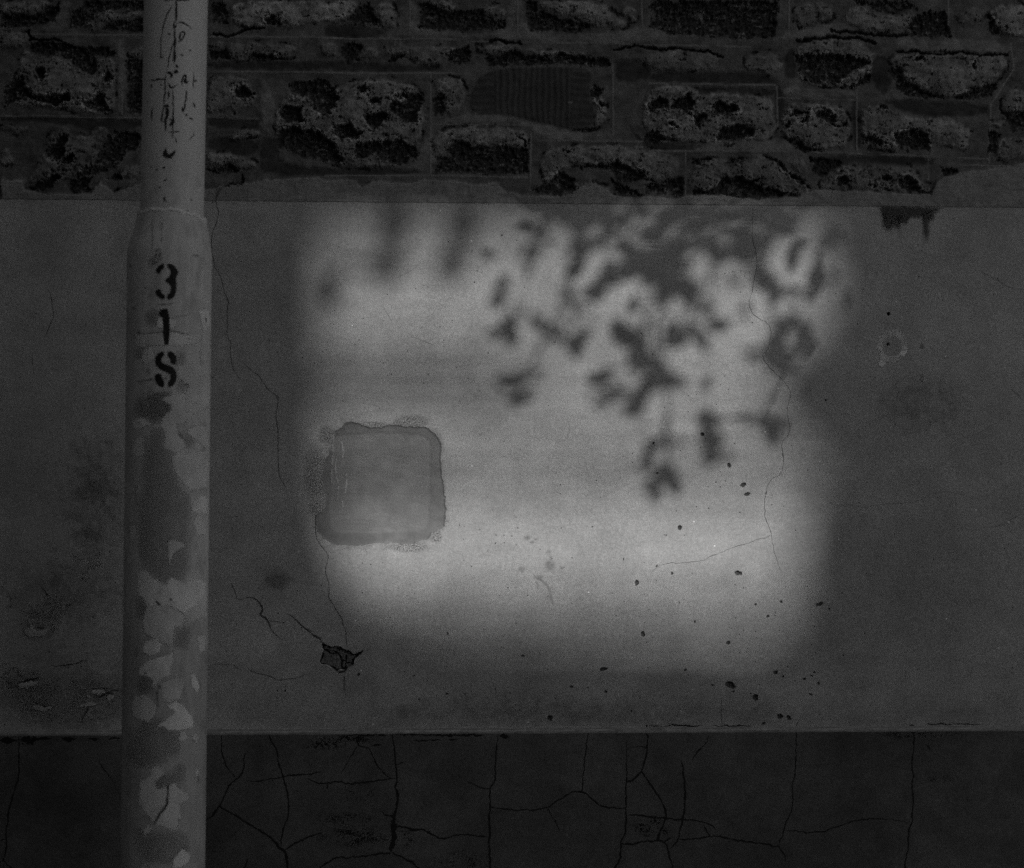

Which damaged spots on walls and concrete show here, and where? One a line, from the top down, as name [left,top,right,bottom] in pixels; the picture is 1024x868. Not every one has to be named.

peeling [132,361,210,536]
crack [211,178,284,484]
crack [654,209,791,570]
peeling [132,570,207,743]
crack [229,515,347,644]
flaking render [316,638,363,676]
peeling [138,766,188,835]
peeling [173,849,191,868]
crack [207,701,915,868]